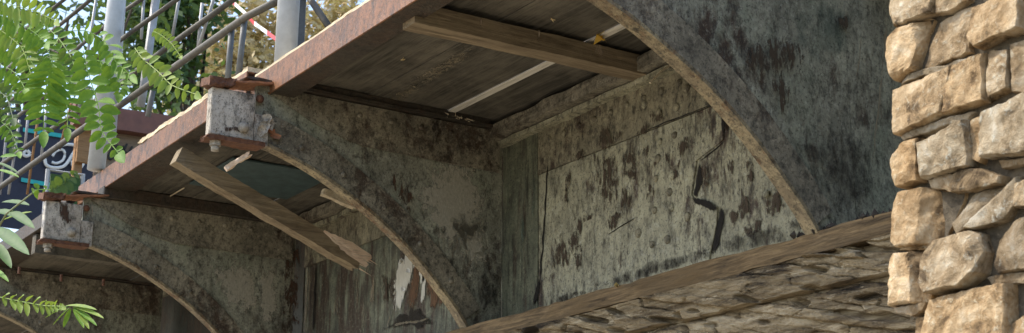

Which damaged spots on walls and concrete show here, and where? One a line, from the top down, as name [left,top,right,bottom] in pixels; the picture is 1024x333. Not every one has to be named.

corrosion [60,200,72,224]
peeling [387,255,430,329]
crack [533,166,548,304]
damp [613,250,710,284]
crack [650,105,725,253]
damp [726,229,780,249]